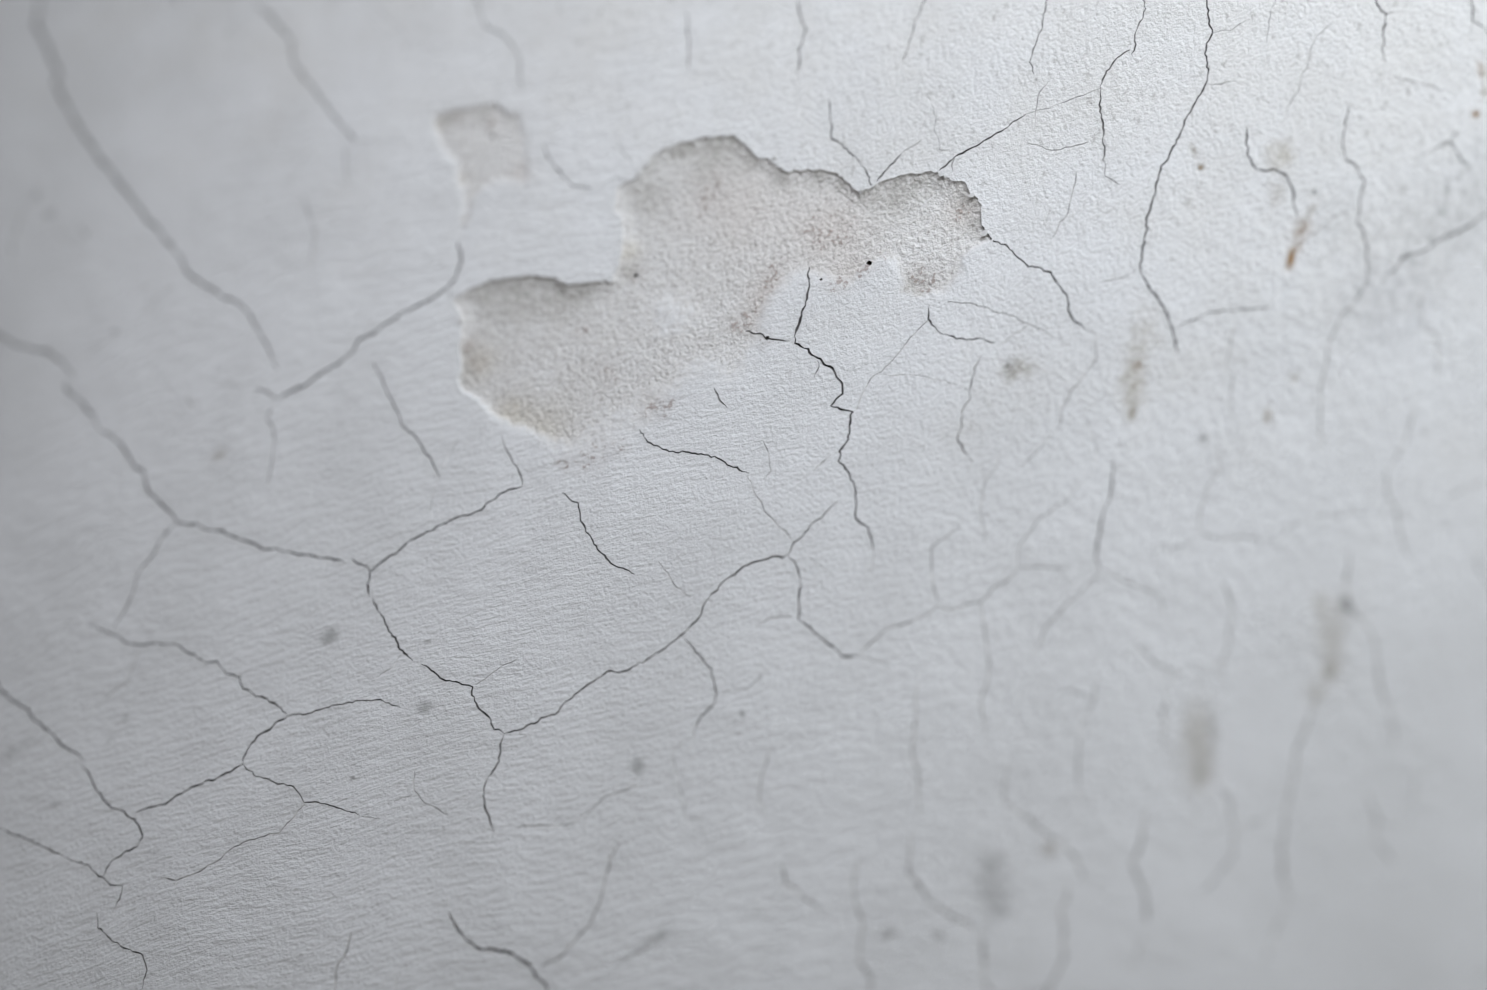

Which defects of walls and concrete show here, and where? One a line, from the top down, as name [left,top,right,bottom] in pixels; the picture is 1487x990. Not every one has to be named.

peeling [429,100,541,240]
peeling [452,133,995,481]
crack [1109,0,1290,353]
crack [1245,0,1487,449]
crack [0,0,1165,990]